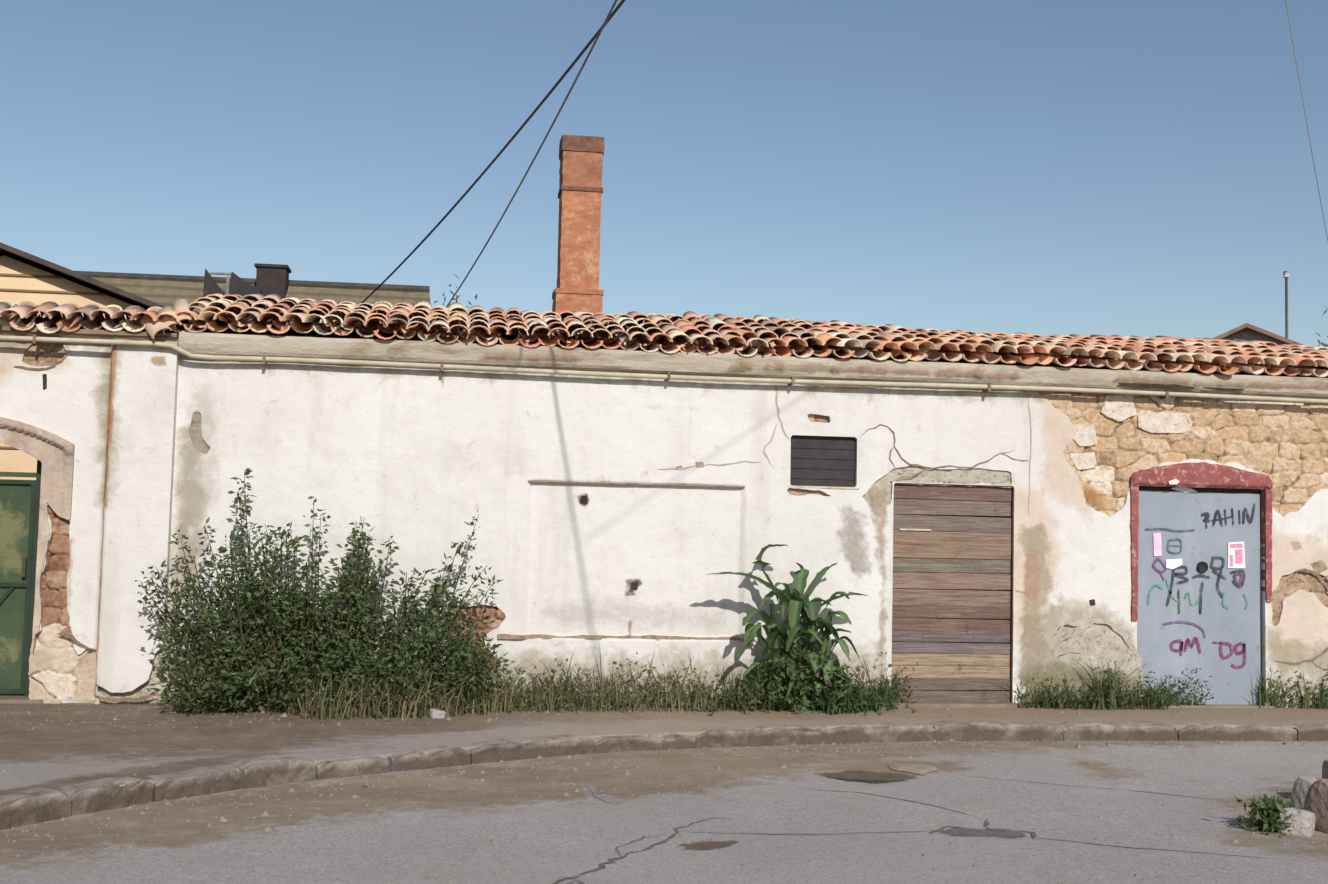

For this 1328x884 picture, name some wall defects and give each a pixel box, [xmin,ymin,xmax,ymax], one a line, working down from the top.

spalling [23,342,66,367]
spalling [190,411,210,454]
crack [658,383,892,470]
spalling [787,485,829,496]
spalling [807,414,829,423]
leakage [838,488,886,573]
spalling [862,466,1013,507]
crack [866,402,1032,508]
spalling [1037,377,1328,516]
spalling [28,505,172,704]
leakage [1022,525,1051,684]
spalling [1271,560,1328,626]